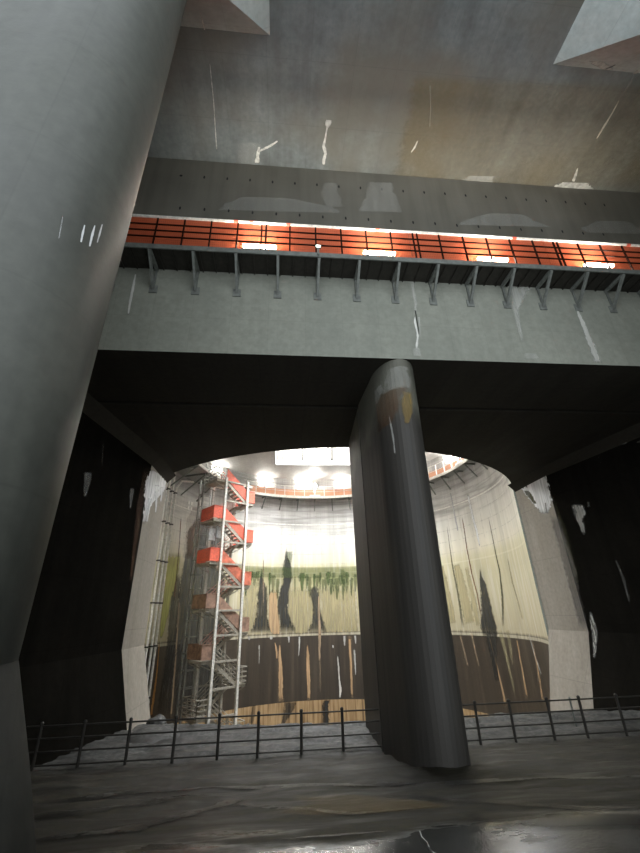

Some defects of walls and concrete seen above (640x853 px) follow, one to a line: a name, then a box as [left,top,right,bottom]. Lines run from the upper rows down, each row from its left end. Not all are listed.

leakage [322,120,331,164]
peeling [522,477,552,512]